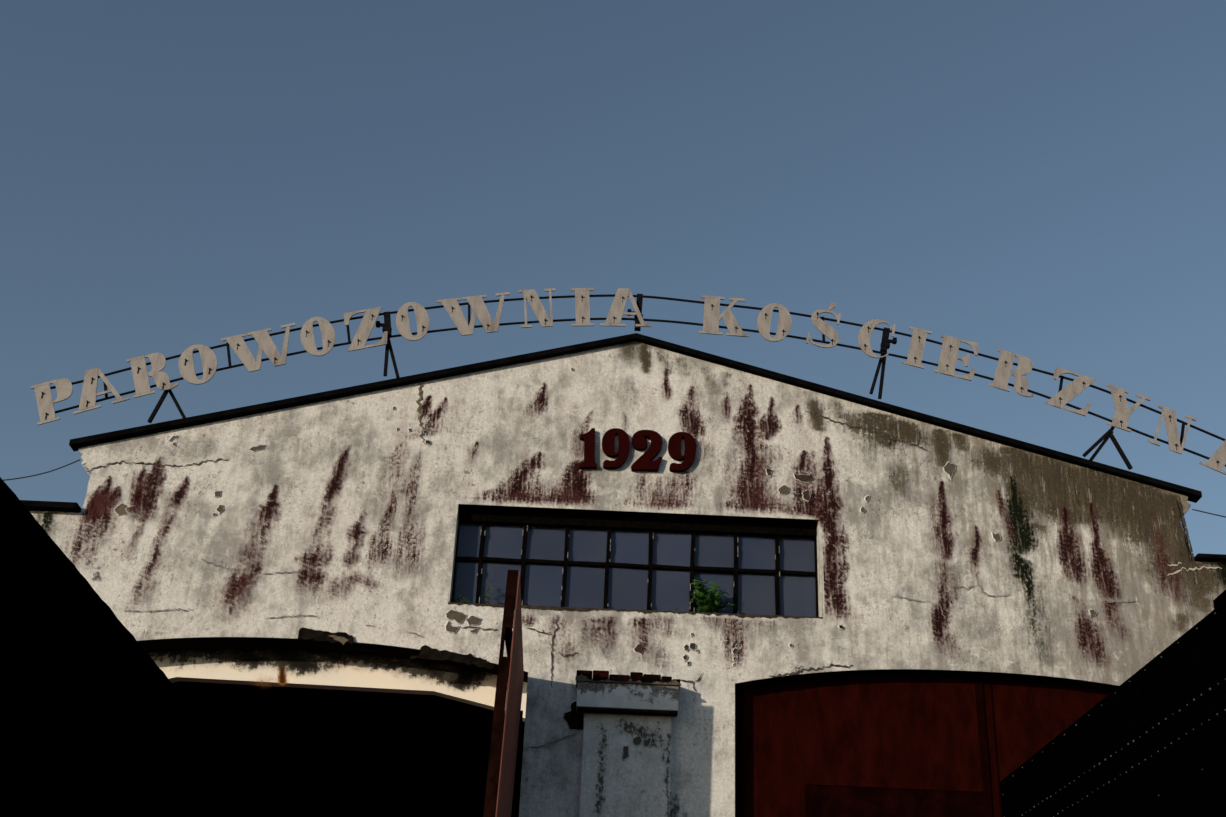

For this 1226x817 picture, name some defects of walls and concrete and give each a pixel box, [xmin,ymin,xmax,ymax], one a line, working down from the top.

corrosion [64,457,189,604]
crack [86,458,228,472]
corrosion [221,485,281,614]
flaking render [298,627,354,645]
corrosion [295,395,448,596]
flaking render [410,645,495,670]
flaking render [445,609,483,634]
corrosion [482,411,596,505]
corrosion [720,384,850,619]
corrosion [928,481,957,654]
damp [1005,476,1057,659]
corrosion [1057,502,1125,666]